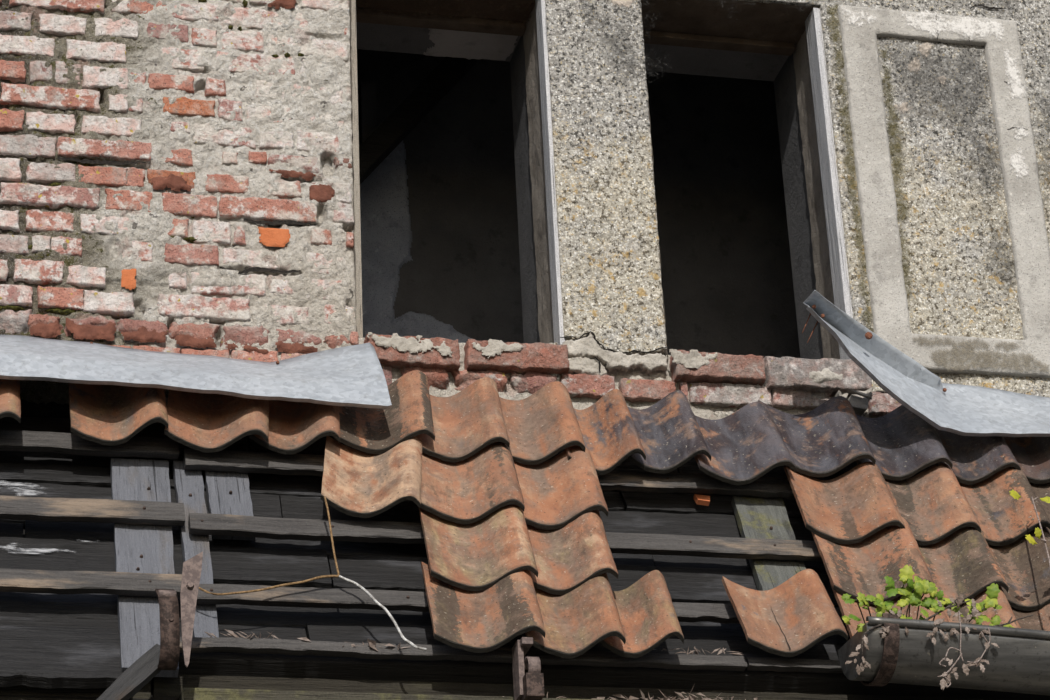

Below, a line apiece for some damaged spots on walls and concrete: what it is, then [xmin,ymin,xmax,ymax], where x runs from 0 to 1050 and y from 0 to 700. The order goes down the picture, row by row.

spalling [268,0,296,10]
spalling [152,174,191,192]
spalling [269,169,335,202]
spalling [259,228,290,247]
spalling [121,269,136,290]
spalling [30,318,318,354]
crack [560,331,667,373]
peeling [0,481,38,496]
peeling [0,543,74,554]